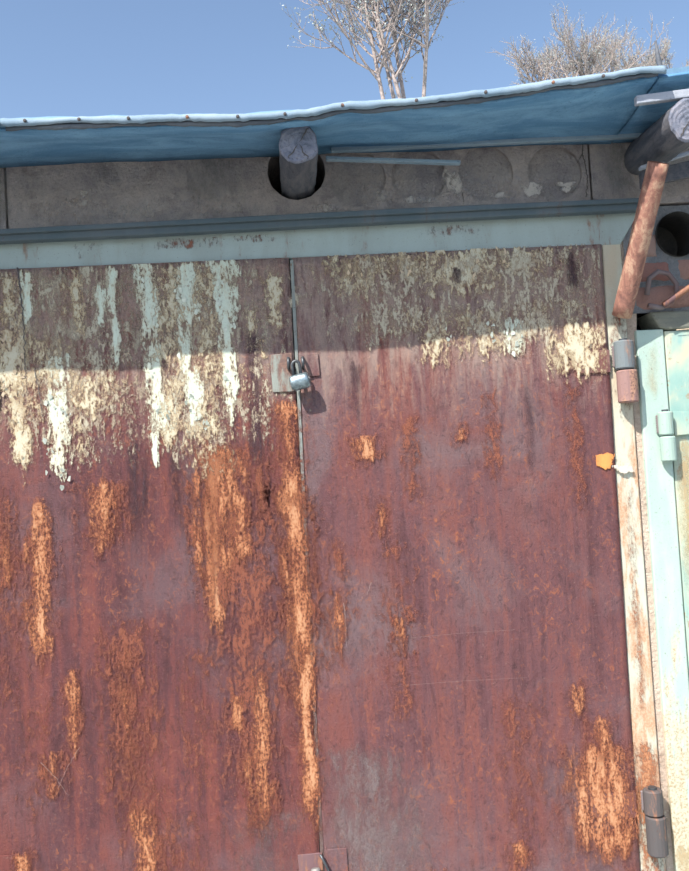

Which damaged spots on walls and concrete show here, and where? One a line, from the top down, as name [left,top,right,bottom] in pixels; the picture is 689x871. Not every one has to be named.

corrosion [0,487,65,706]
corrosion [67,478,131,562]
corrosion [164,397,355,839]
peeling [0,244,607,491]
corrosion [346,429,386,468]
corrosion [369,496,419,720]
corrosion [11,850,38,871]
corrosion [545,678,666,871]